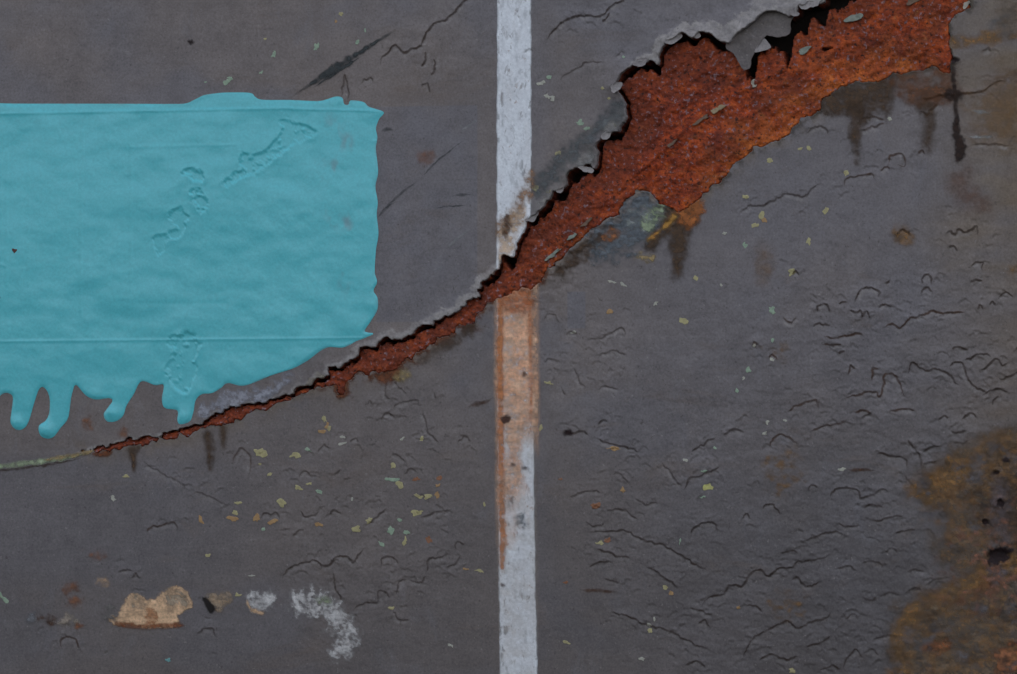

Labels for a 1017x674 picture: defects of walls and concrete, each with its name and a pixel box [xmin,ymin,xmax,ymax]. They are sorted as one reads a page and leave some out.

crack [386,0,465,66]
rust [82,0,1016,569]
crack [816,262,1012,429]
peeling [198,373,324,417]
peeling [378,475,442,547]
crack [714,550,817,596]
rust [993,642,1017,674]